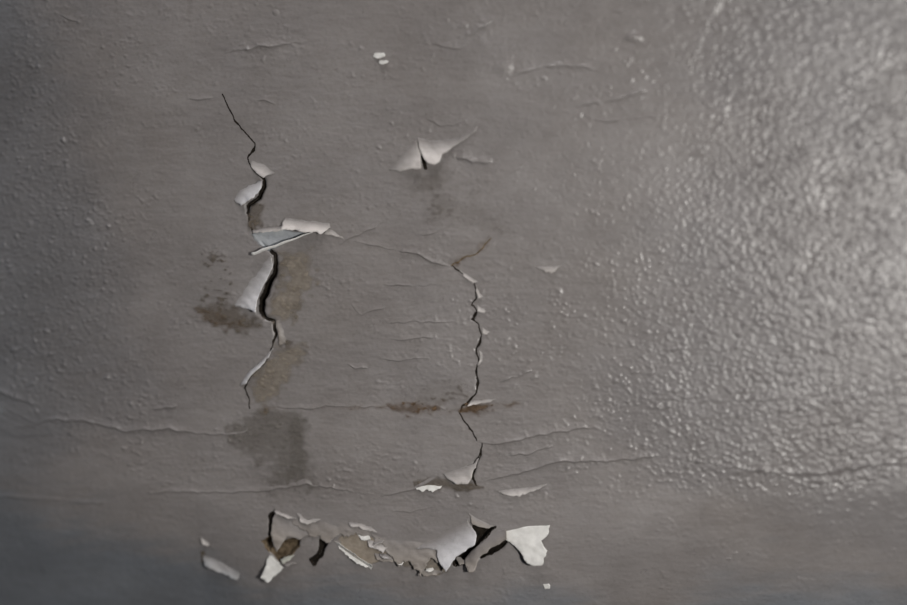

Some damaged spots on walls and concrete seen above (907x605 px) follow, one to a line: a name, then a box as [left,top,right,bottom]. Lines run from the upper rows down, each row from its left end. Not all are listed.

peeling [389,126,478,171]
crack [222,94,344,414]
crack [397,238,495,486]
peeling [380,458,483,497]
peeling [497,484,547,497]
peeling [201,538,240,580]
peeling [260,510,550,583]